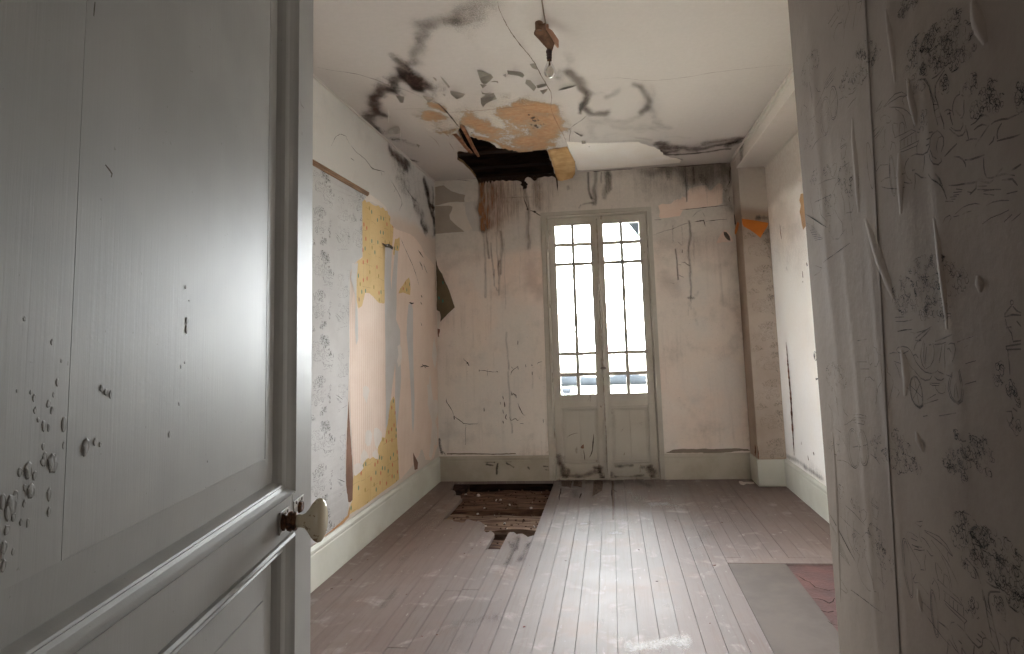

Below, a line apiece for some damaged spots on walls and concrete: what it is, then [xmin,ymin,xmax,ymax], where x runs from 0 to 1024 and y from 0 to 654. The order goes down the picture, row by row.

crack [327,2,586,150]
water stain [362,55,565,152]
water stain [565,70,607,115]
water stain [388,139,417,178]
water stain [414,178,435,236]
water stain [478,181,505,232]
spalling [477,173,558,191]
flaking render [658,183,723,218]
crack [446,392,524,445]